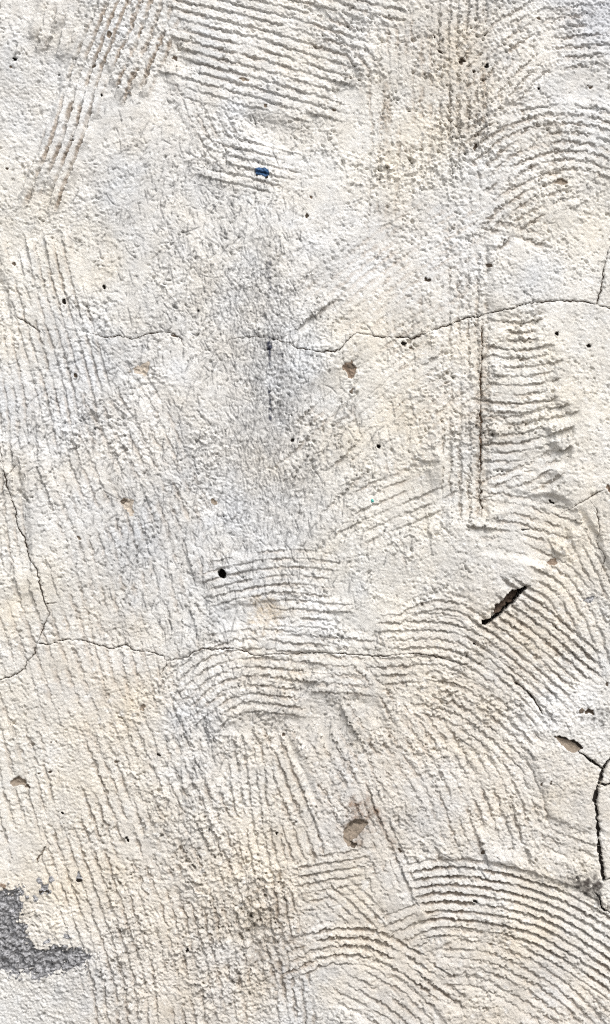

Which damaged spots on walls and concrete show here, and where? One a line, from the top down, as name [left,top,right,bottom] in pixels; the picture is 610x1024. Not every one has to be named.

crack [90,332,182,342]
crack [229,247,610,515]
crack [0,447,464,680]
spalling [493,589,517,614]
crack [579,752,610,912]
spalling [0,876,95,983]